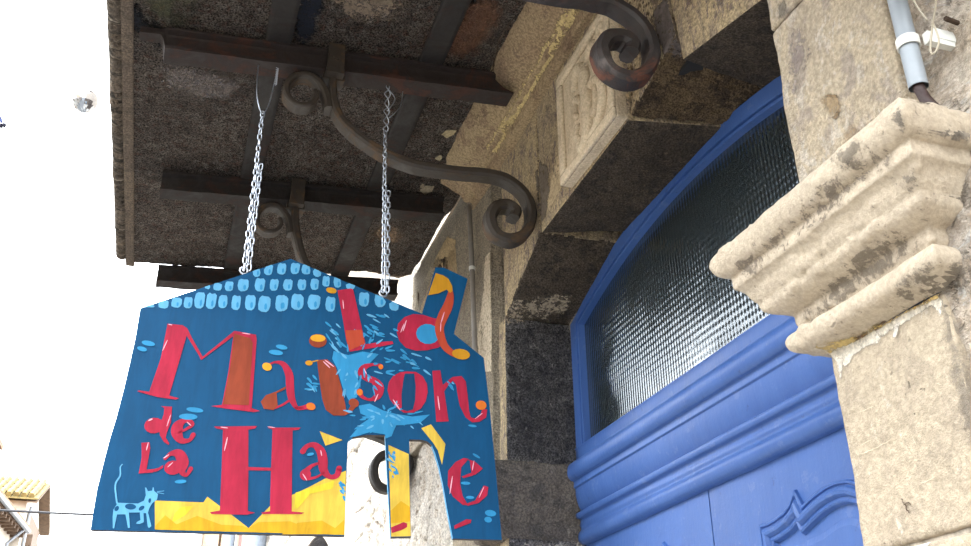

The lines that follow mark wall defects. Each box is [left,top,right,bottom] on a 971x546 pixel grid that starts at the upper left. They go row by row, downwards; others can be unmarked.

peeling [816,295,942,378]